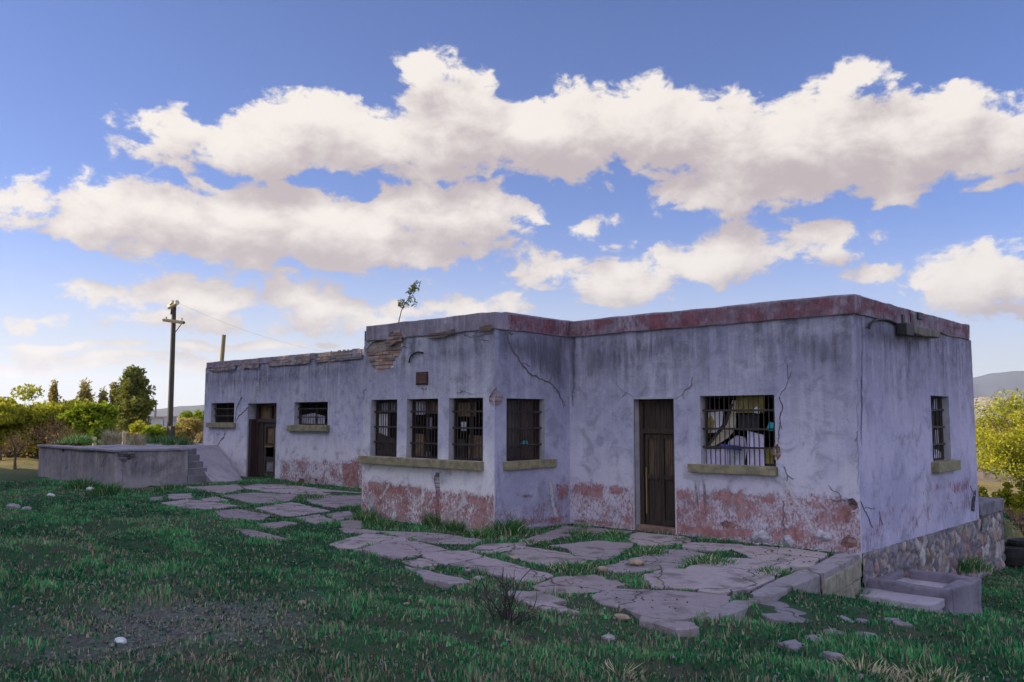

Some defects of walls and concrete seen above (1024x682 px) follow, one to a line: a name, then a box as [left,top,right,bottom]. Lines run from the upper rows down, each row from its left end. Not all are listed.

spalling [209,329,403,372]
crack [460,331,565,408]
crack [218,397,249,445]
crack [778,358,793,535]
peeling [280,457,494,530]
peeling [509,480,633,529]
peeling [676,490,881,553]